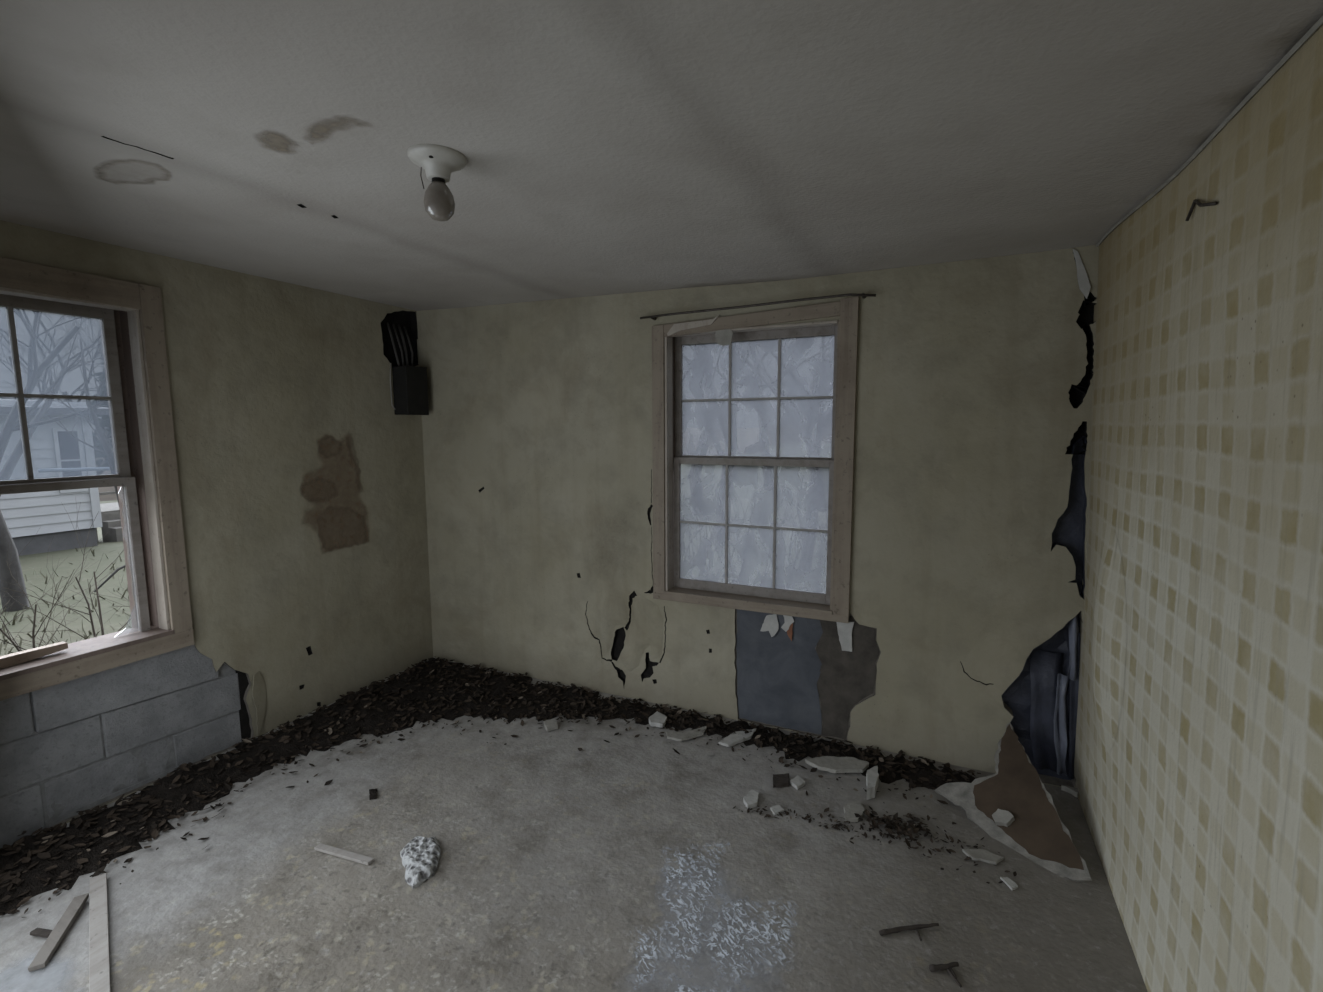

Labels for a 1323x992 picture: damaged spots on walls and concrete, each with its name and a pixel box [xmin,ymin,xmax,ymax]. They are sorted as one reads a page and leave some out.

water stain [260,133,292,152]
water stain [311,118,360,139]
flaking render [0,644,267,849]
crack [585,469,667,672]
flaking render [734,609,881,742]
flaking render [1002,436,1087,787]